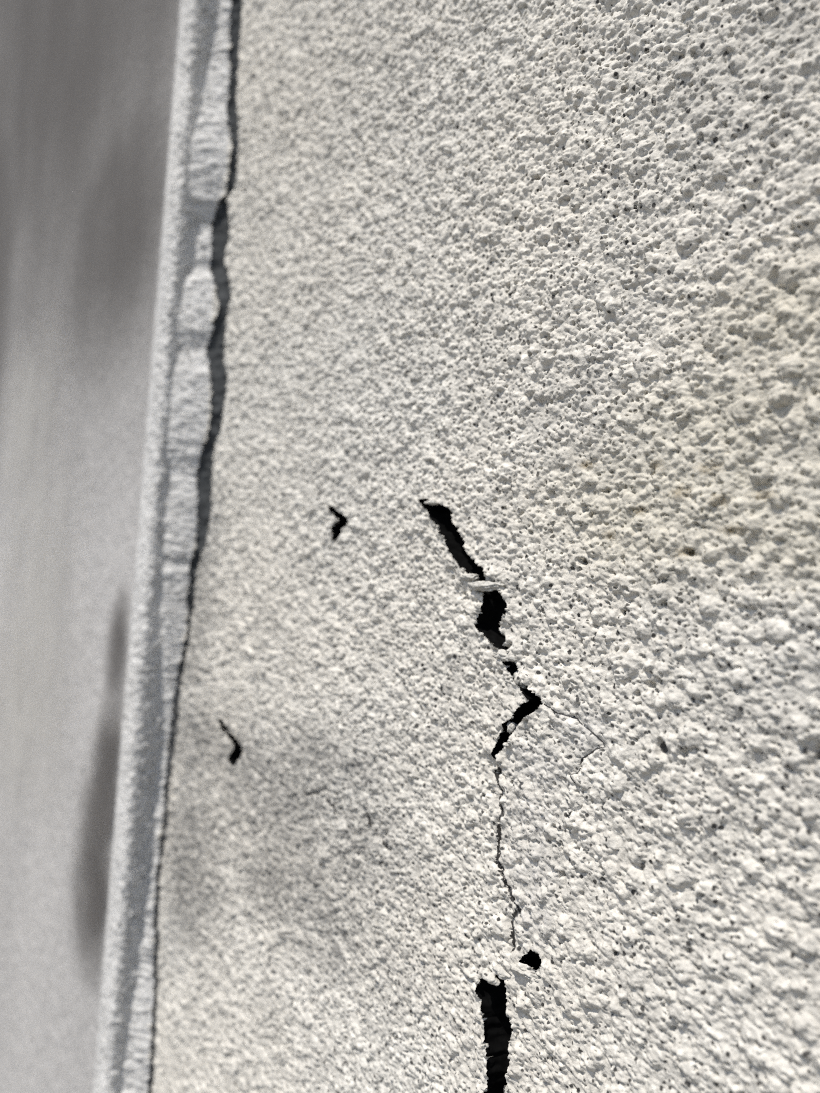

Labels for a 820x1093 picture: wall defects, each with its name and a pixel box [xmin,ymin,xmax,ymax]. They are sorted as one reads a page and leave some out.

crack [147,0,243,1093]
crack [317,490,349,542]
crack [218,719,339,816]
crack [366,811,391,851]
crack [418,500,605,1093]